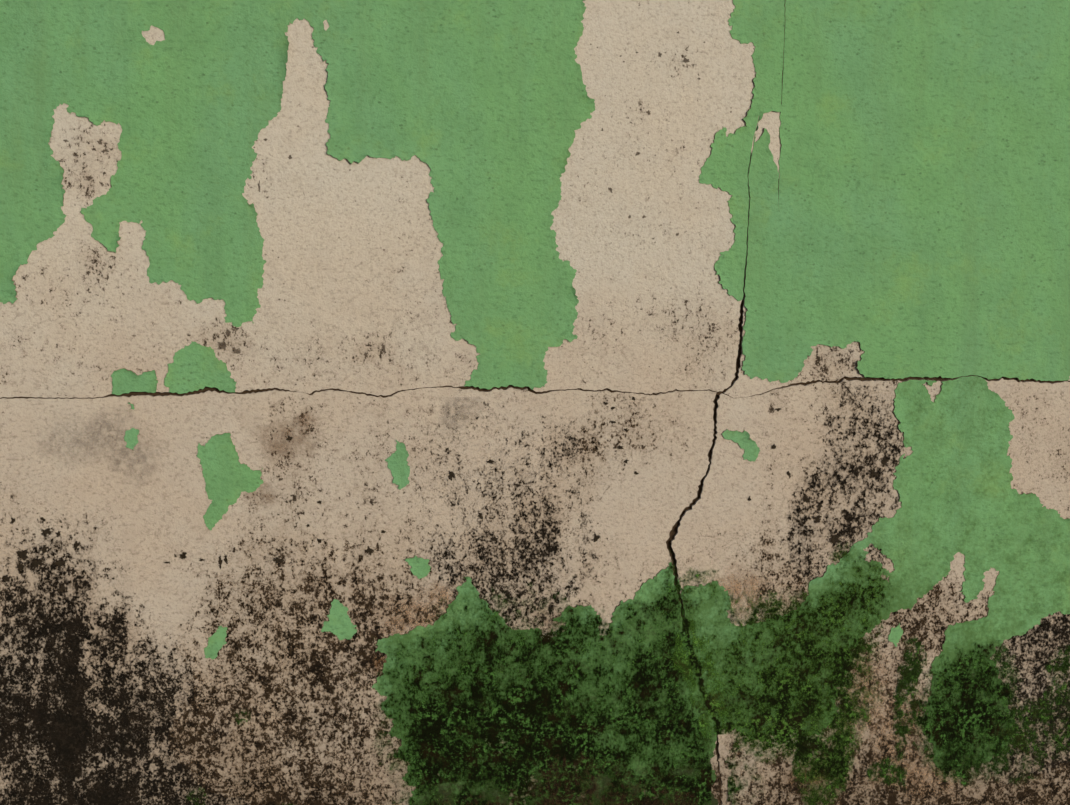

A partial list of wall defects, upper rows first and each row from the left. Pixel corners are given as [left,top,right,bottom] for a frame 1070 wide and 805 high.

peeling [0,18,480,398]
peeling [533,0,864,398]
leakage [0,393,654,805]
peeling [0,379,913,805]
crack [0,155,1070,635]
crack [714,736,722,805]
leakage [723,386,904,620]
peeling [710,552,1070,805]
leakage [712,567,1070,805]
peeling [906,379,953,402]
peeling [986,376,1070,519]